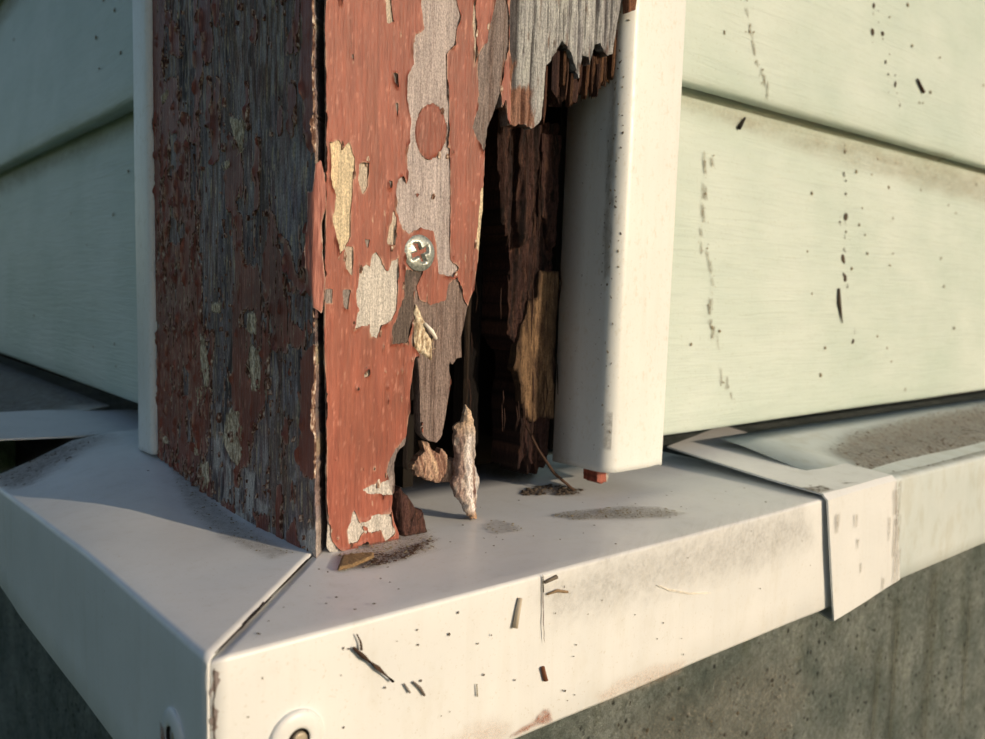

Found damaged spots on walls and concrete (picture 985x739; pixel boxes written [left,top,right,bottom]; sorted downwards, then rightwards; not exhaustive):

peeling [473,0,508,150]
peeling [622,0,637,14]
peeling [152,0,467,558]
peeling [474,188,483,250]